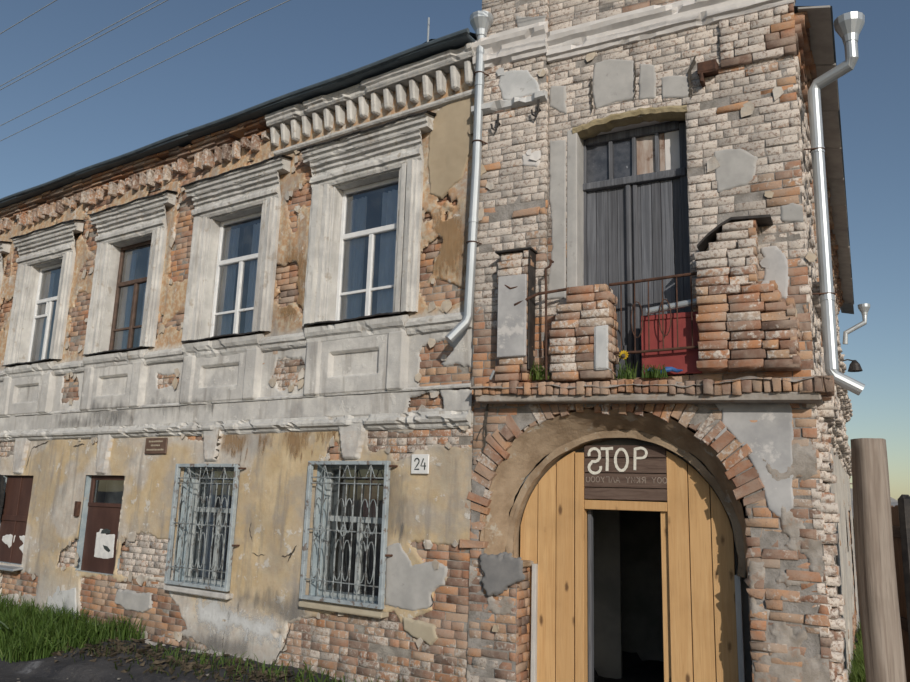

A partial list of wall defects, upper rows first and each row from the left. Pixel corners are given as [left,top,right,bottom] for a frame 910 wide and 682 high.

flaking render [284,143,312,233]
flaking render [148,150,232,285]
flaking render [419,265,475,313]
flaking render [156,309,185,343]
flaking render [61,372,79,405]
flaking render [157,368,179,390]
flaking render [268,351,305,392]
flaking render [367,338,474,461]
flaking render [0,570,38,603]
flaking render [57,531,209,652]
flaking render [274,540,470,682]